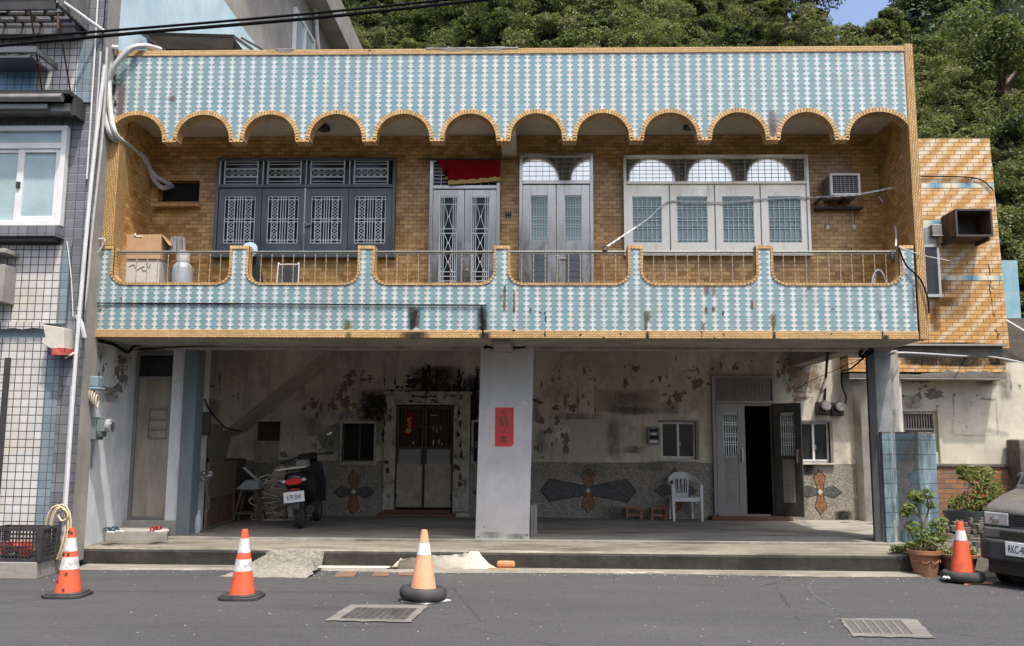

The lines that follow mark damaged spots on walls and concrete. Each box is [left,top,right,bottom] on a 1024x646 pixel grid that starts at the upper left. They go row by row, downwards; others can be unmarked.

peeling [98,350,131,398]
water stain [361,391,385,421]
flaking render [301,362,480,487]
water stain [414,367,480,434]
peeling [533,364,597,459]
peeling [649,356,754,411]
spalling [899,369,1022,408]